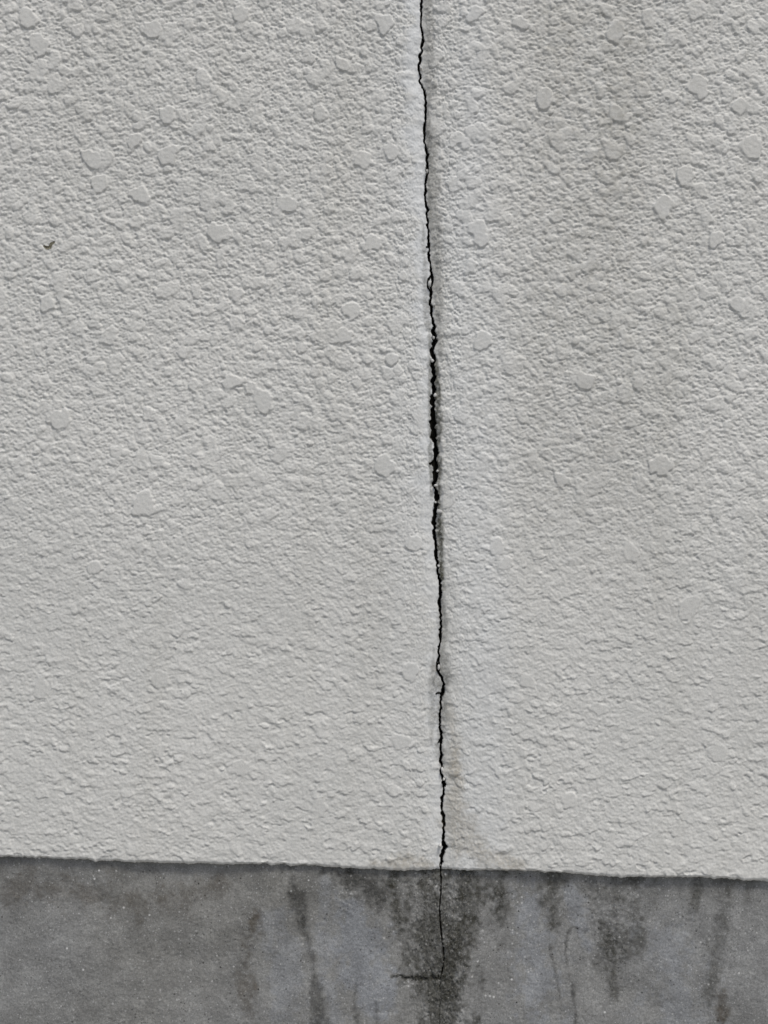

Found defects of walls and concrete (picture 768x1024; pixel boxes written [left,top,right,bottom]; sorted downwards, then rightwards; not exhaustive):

crack [418,0,448,975]